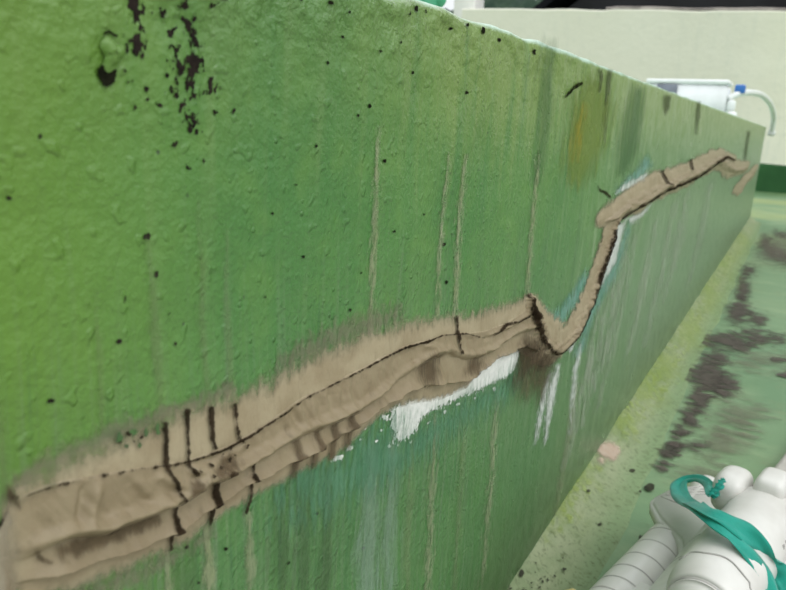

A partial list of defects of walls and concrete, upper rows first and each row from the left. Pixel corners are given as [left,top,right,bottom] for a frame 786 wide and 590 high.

peeling [617,158,652,194]
crack [2,148,758,590]
peeling [298,350,520,503]
water stain [535,366,560,440]
water stain [559,345,582,487]
peeling [568,205,650,357]
peeling [598,443,620,463]
water stain [653,227,786,472]